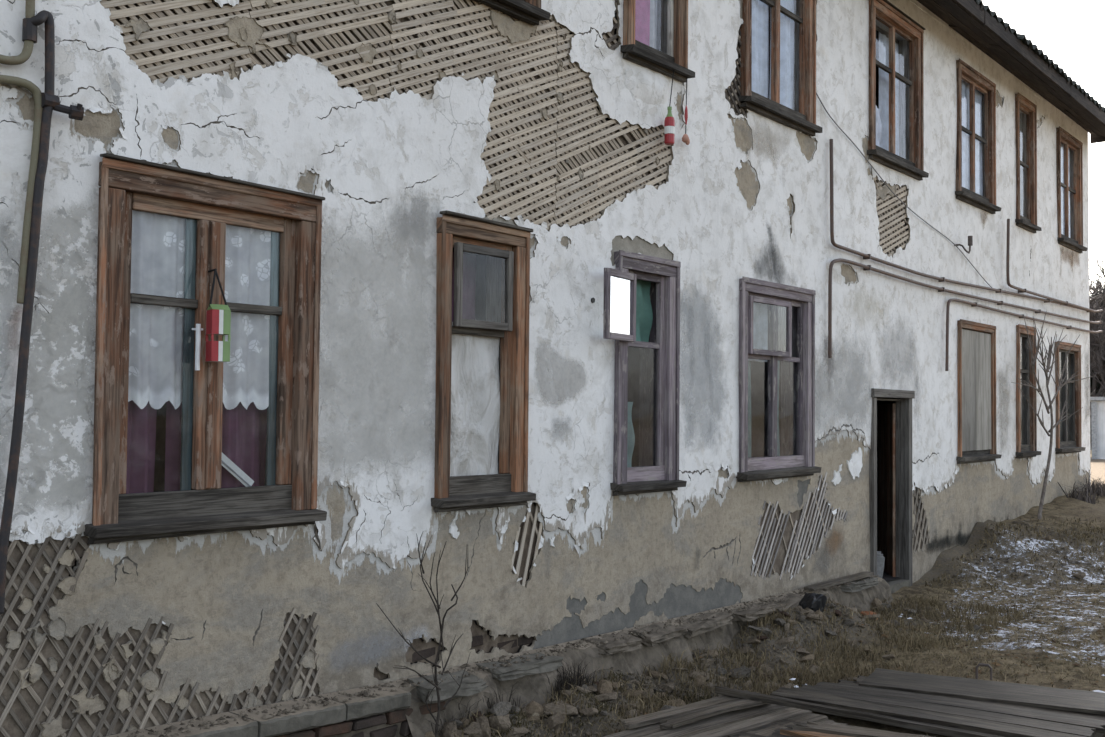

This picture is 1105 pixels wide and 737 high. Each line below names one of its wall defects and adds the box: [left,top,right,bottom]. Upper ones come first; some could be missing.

crack [181,113,259,138]
crack [315,100,367,120]
spalling [97,0,674,259]
peeling [674,83,686,130]
peeling [725,0,761,212]
crack [340,176,464,204]
spalling [862,134,910,257]
spalling [610,235,674,266]
crack [314,523,322,552]
crack [356,484,418,591]
peeling [0,430,870,737]
peeling [912,452,1091,583]